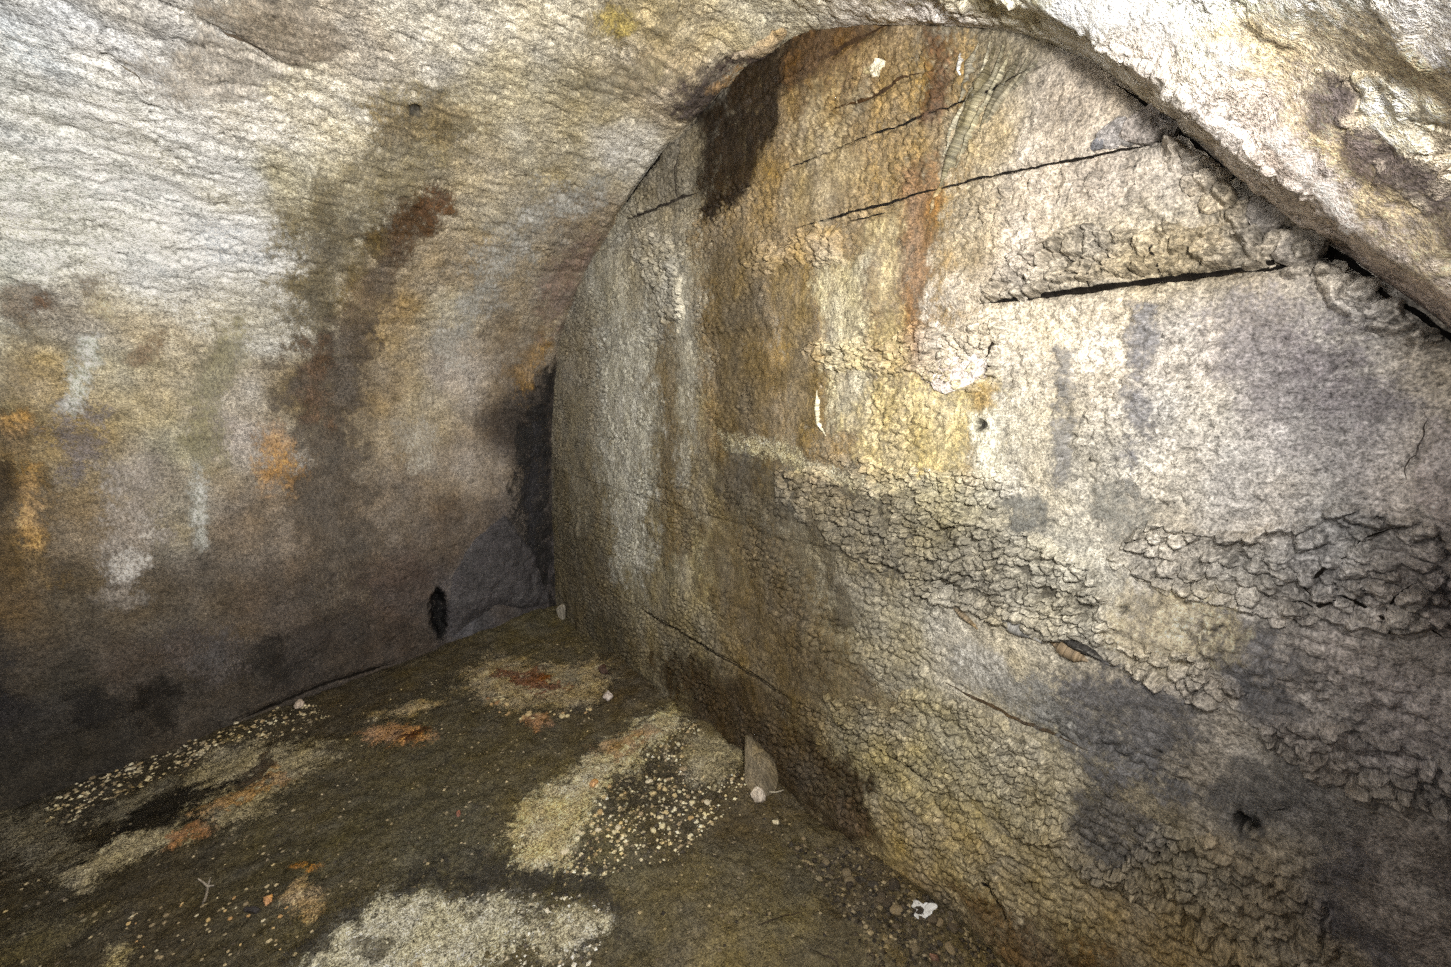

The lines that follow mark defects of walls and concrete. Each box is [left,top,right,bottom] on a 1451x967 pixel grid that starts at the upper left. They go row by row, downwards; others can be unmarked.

crack [620,25,887,219]
water stain [696,24,873,222]
crack [788,66,1034,169]
crack [796,130,1237,228]
crack [1114,81,1148,106]
water stain [45,333,111,483]
water stain [178,81,490,617]
corrosion [690,25,996,499]
crack [979,219,1451,342]
water stain [278,174,987,967]
water stain [1008,565,1058,598]
crack [1258,527,1417,620]